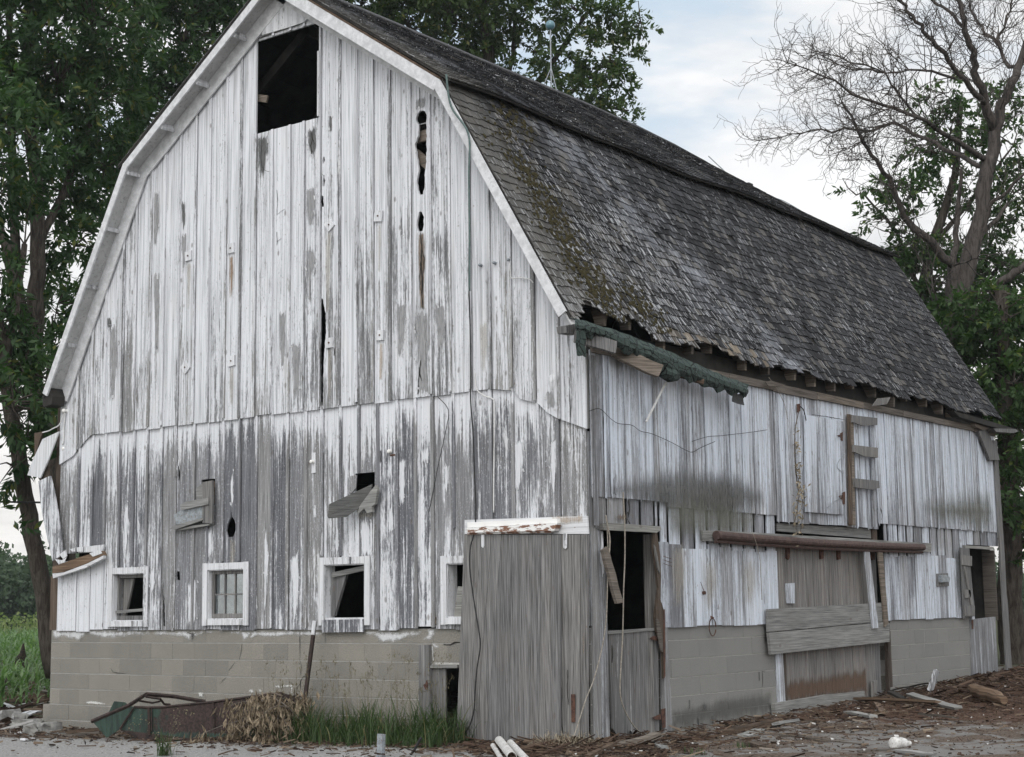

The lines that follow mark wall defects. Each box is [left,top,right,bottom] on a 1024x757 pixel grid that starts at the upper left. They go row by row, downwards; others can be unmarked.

peeling [257,136,268,176]
peeling [305,128,316,158]
peeling [305,188,315,224]
peeling [305,251,317,301]
peeling [105,318,119,399]
peeling [278,311,301,399]
peeling [387,460,407,534]
peeling [185,579,199,638]
peeling [203,529,213,563]
peeling [256,533,269,611]
peeling [290,552,301,619]
peeling [361,519,374,557]